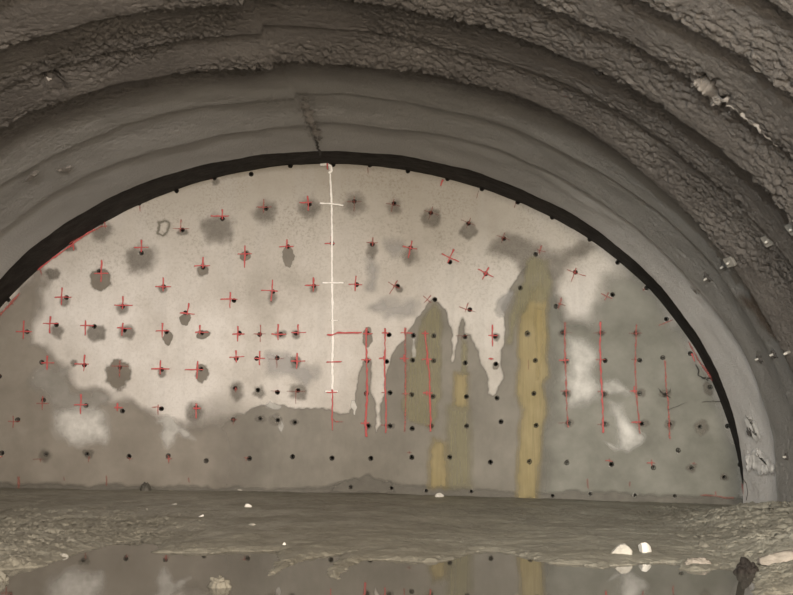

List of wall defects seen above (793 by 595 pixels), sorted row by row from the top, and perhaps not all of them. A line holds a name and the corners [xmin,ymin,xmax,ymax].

spalling [690,73,726,107]
water stain [0,236,743,505]
spalling [745,416,774,475]